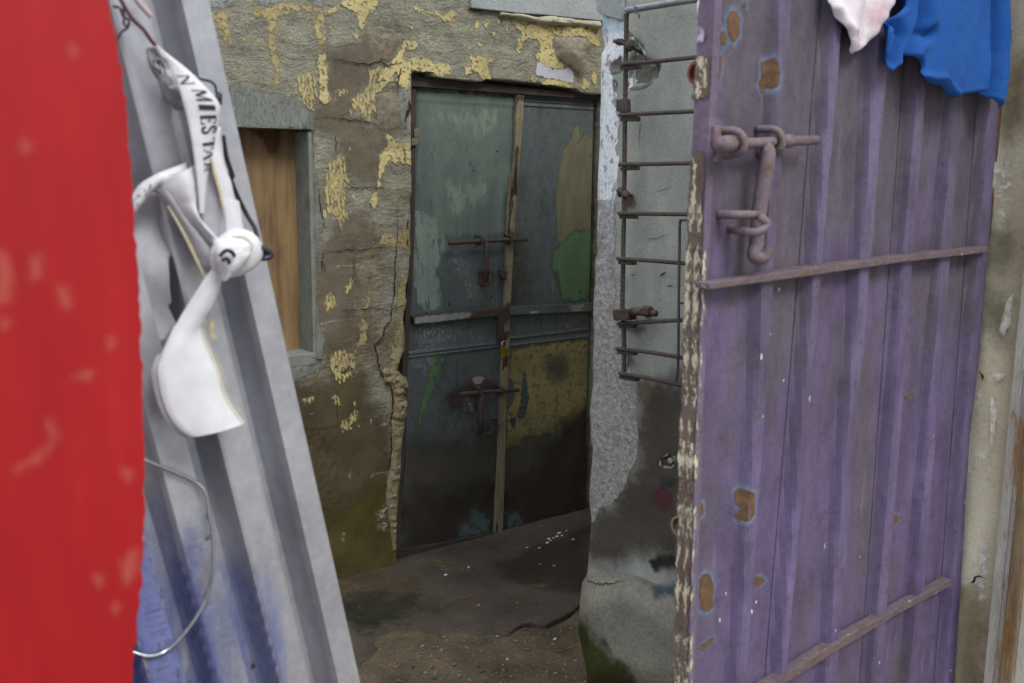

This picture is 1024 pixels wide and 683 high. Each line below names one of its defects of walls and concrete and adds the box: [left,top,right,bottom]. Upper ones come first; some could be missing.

peeling [209,0,456,123]
peeling [323,155,355,230]
crack [317,58,411,162]
peeling [369,133,411,209]
peeling [324,278,354,312]
peeling [330,294,372,405]
crack [319,186,409,494]
spalling [465,12,660,523]
leakage [294,370,391,541]
peeling [340,402,358,432]
spalling [382,274,409,551]
leakage [498,381,682,590]